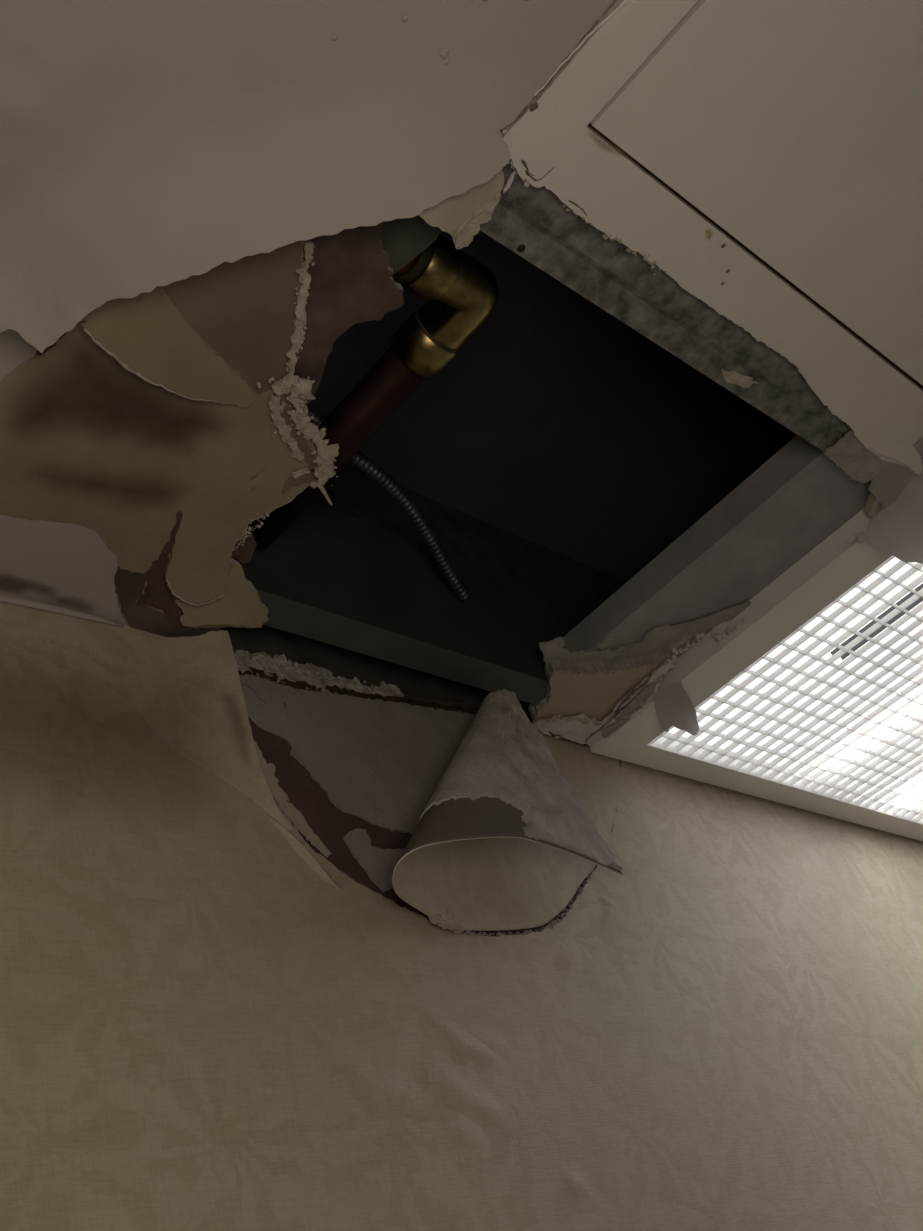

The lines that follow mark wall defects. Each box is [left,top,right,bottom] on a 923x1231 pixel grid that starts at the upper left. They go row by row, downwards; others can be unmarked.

spalling [824,430,882,483]
peeling [0,241,623,931]
spalling [539,601,751,667]